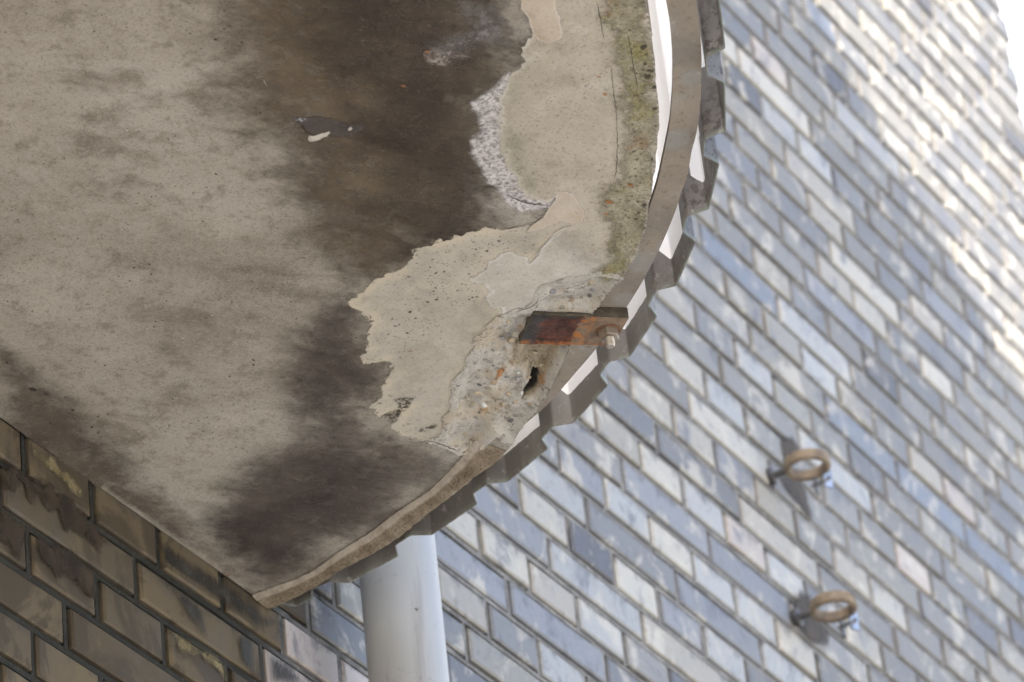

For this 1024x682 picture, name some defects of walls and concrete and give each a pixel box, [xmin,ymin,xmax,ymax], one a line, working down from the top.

spalling [294,117,365,142]
leakage [224,0,556,277]
peeling [348,0,660,456]
leakage [1,352,184,539]
leakage [209,304,421,576]